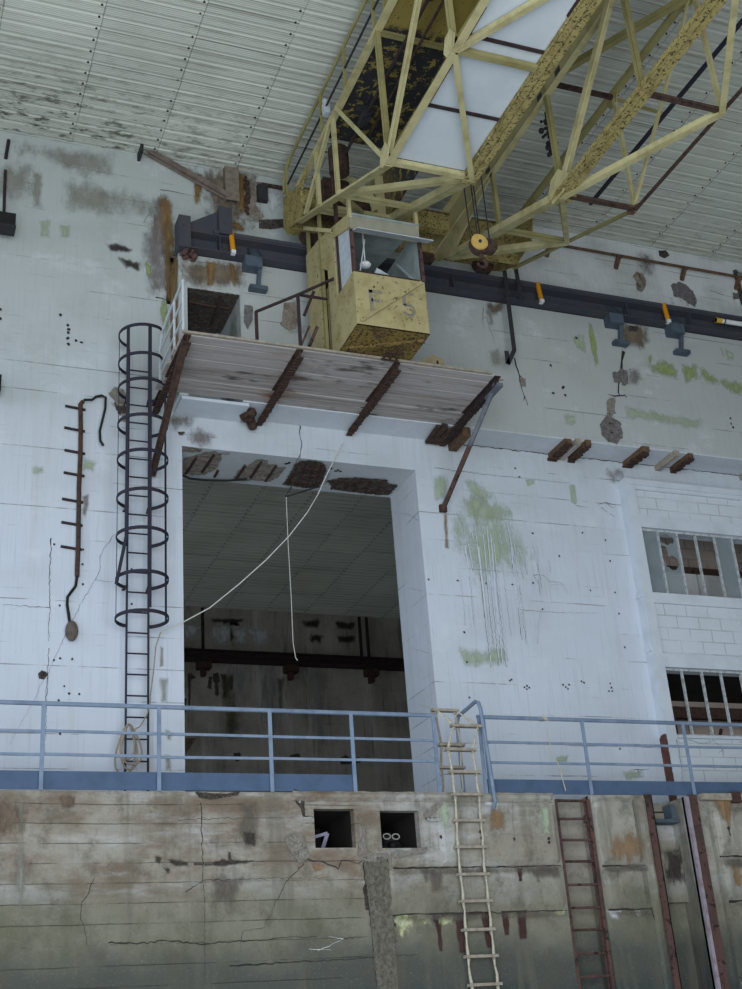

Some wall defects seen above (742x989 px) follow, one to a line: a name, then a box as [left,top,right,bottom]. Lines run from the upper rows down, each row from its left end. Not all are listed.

leakage [50,152,106,169]
leakage [0,169,41,205]
leakage [71,188,151,210]
spalling [671,281,697,306]
spalling [600,415,623,444]
spalling [178,431,230,478]
spalling [234,459,397,496]
crack [80,800,566,989]
corrosion [434,911,492,952]
corrosion [502,910,526,939]